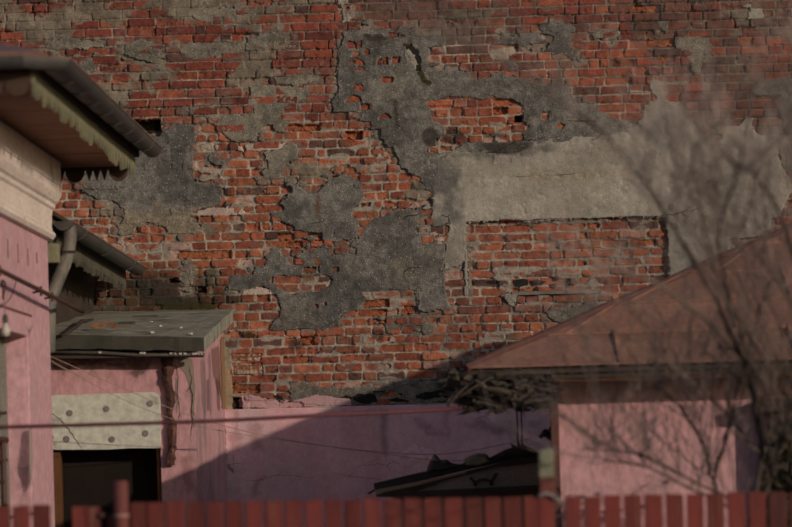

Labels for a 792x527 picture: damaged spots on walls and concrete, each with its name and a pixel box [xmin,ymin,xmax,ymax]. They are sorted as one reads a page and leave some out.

peeling [43,37,106,75]
peeling [63,0,792,346]
peeling [175,358,196,427]
peeling [219,334,451,410]